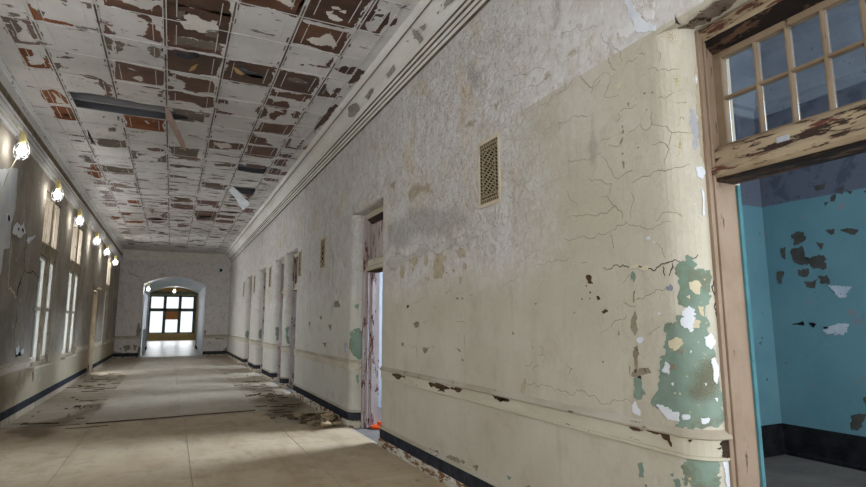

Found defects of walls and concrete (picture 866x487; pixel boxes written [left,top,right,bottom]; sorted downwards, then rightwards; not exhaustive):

peeling [677,0,736,29]
peeling [407,24,425,44]
peeling [0,0,397,247]
crack [505,26,698,331]
spalling [400,248,467,285]
peeling [780,228,858,298]
peeling [349,328,362,360]
peeling [628,255,725,447]
peeling [793,321,849,335]
spalling [849,396,866,431]
peeling [670,440,730,487]